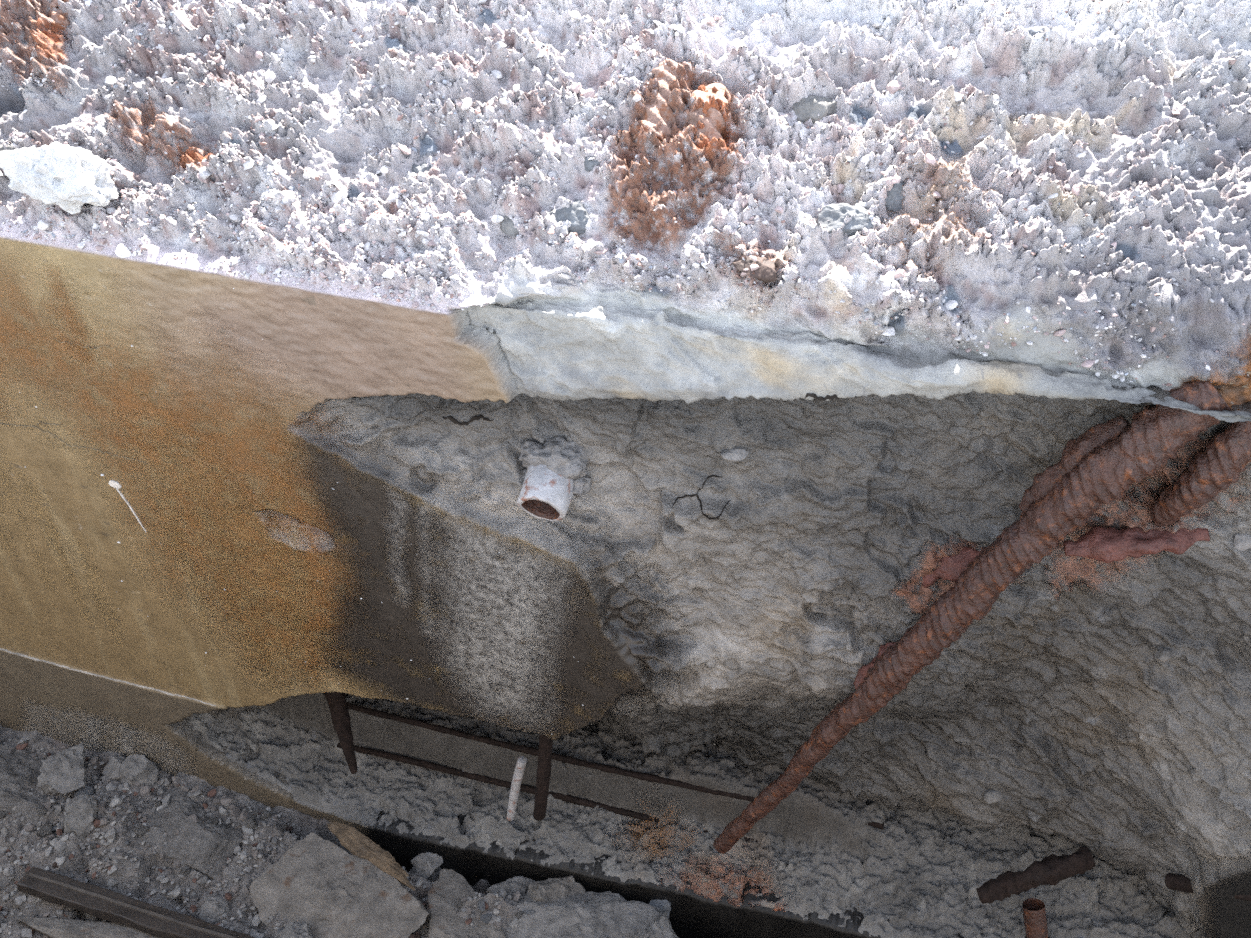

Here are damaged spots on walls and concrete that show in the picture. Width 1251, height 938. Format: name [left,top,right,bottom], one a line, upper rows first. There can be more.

corrosion [0,0,65,87]
corrosion [112,103,214,169]
corrosion [604,61,742,250]
corrosion [1193,339,1251,410]
corrosion [1052,439,1214,592]
water stain [306,443,669,740]
spalling [166,260,1251,938]
corrosion [896,541,977,614]
corrosion [681,863,767,907]